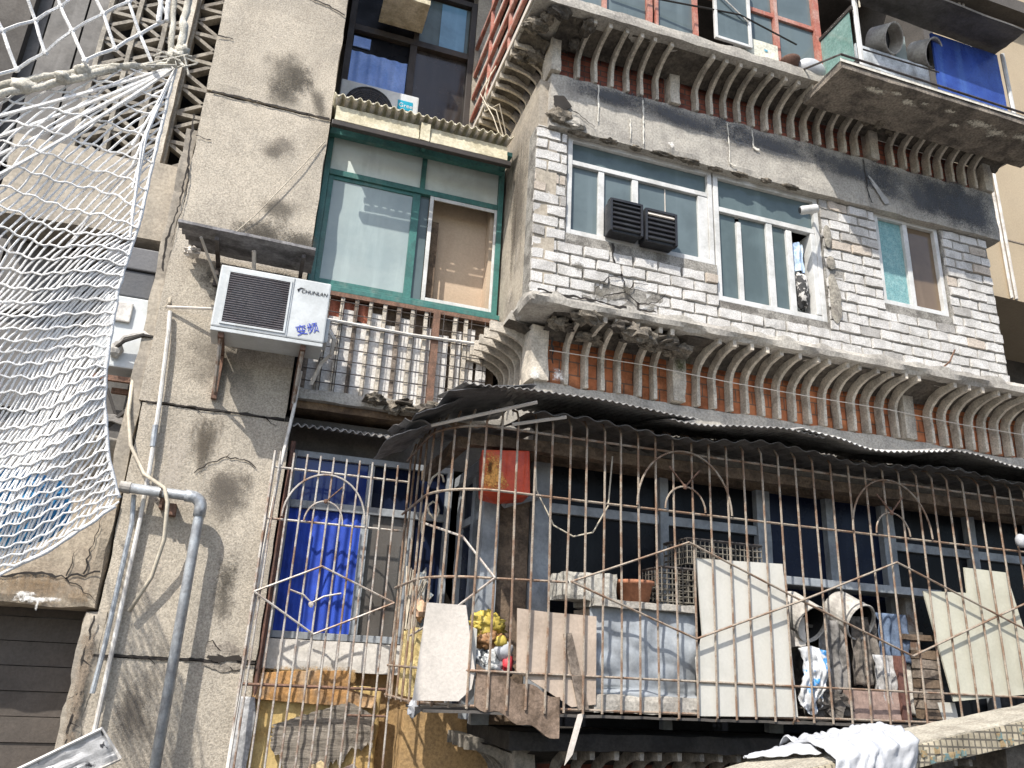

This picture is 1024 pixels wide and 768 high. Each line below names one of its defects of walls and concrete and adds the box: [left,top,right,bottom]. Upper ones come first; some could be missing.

spalling [521,5,597,54]
spalling [512,48,547,70]
water stain [271,57,324,113]
crack [537,243,666,313]
spalling [547,309,694,360]
crack [194,453,256,473]
crack [0,517,255,743]